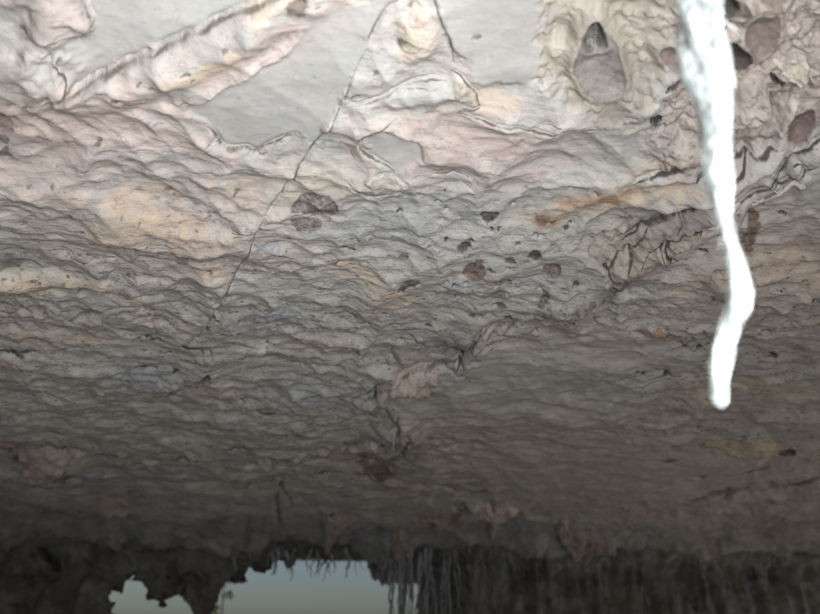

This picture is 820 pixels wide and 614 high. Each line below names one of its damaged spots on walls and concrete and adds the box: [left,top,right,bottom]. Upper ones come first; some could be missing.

crack [46,44,67,98]
crack [603,229,647,286]
crack [664,240,678,268]
crack [178,233,254,359]
crack [380,323,432,365]
crack [445,319,553,382]